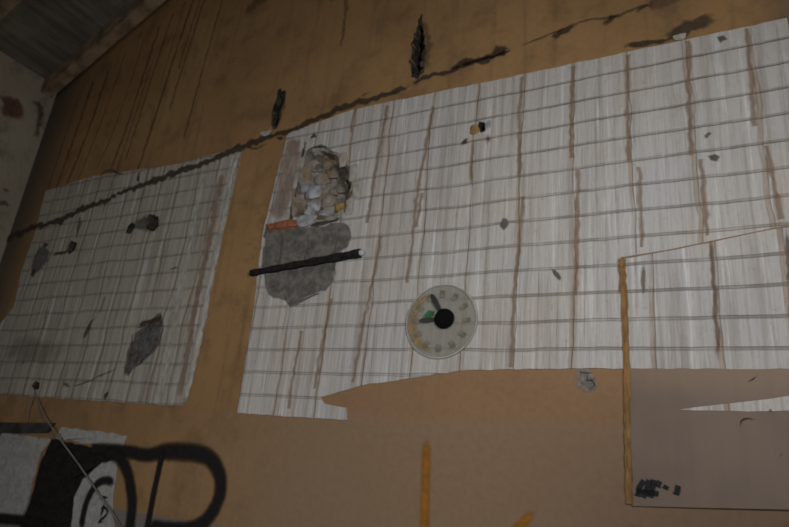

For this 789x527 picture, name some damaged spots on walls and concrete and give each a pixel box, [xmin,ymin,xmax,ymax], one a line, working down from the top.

peeling [629,15,712,47]
spalling [126,214,159,234]
peeling [262,134,362,307]
crack [6,4,650,242]
corrosion [412,106,434,234]
peeling [124,313,163,376]
corrosion [618,258,633,504]
corrosion [710,246,720,352]